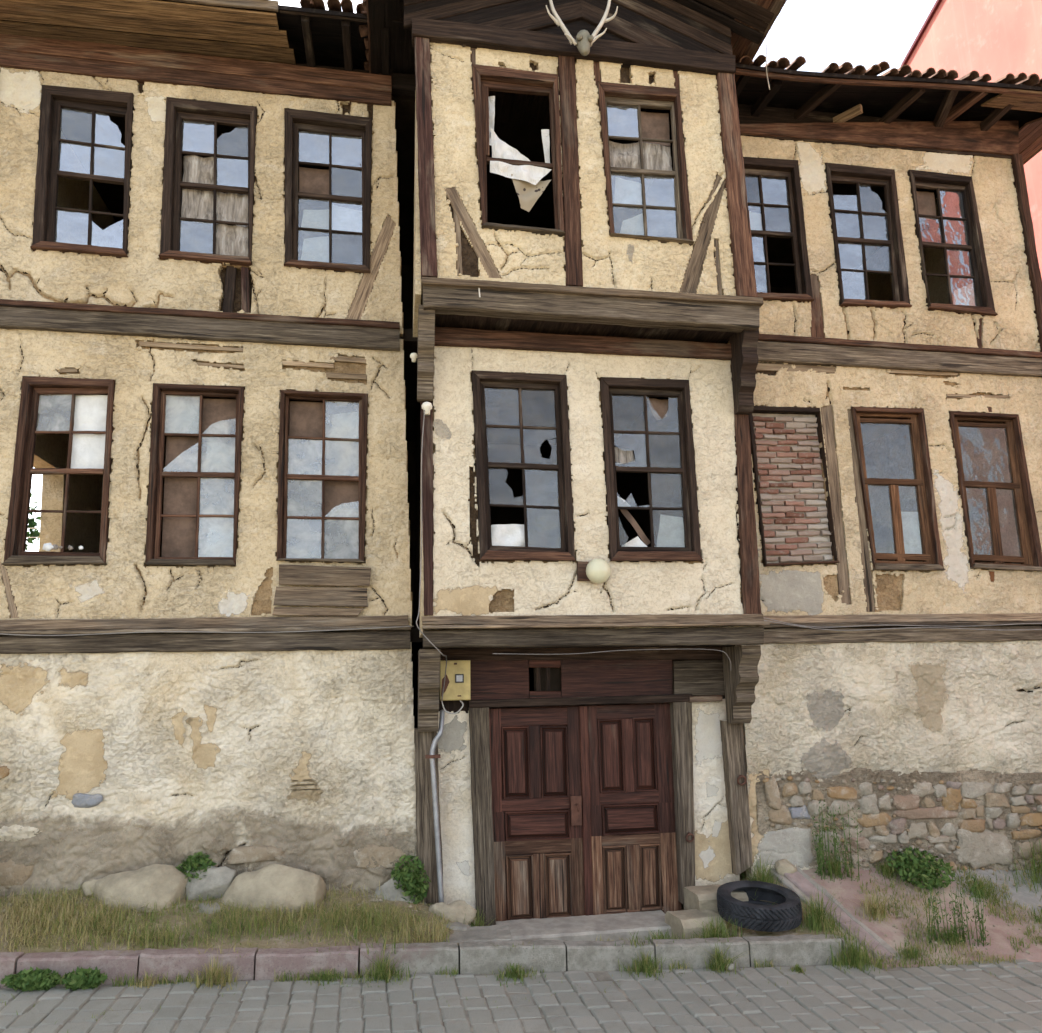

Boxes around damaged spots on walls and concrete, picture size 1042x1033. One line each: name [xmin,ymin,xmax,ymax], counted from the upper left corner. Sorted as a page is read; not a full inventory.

crack [489,233,614,281]
crack [0,265,173,306]
peeling [433,585,516,616]
crack [535,573,613,611]
spalling [875,570,906,612]
peeling [0,662,88,715]
peeling [909,663,948,731]
peeling [172,704,221,769]
flaking render [0,766,10,780]
peeling [51,729,108,808]